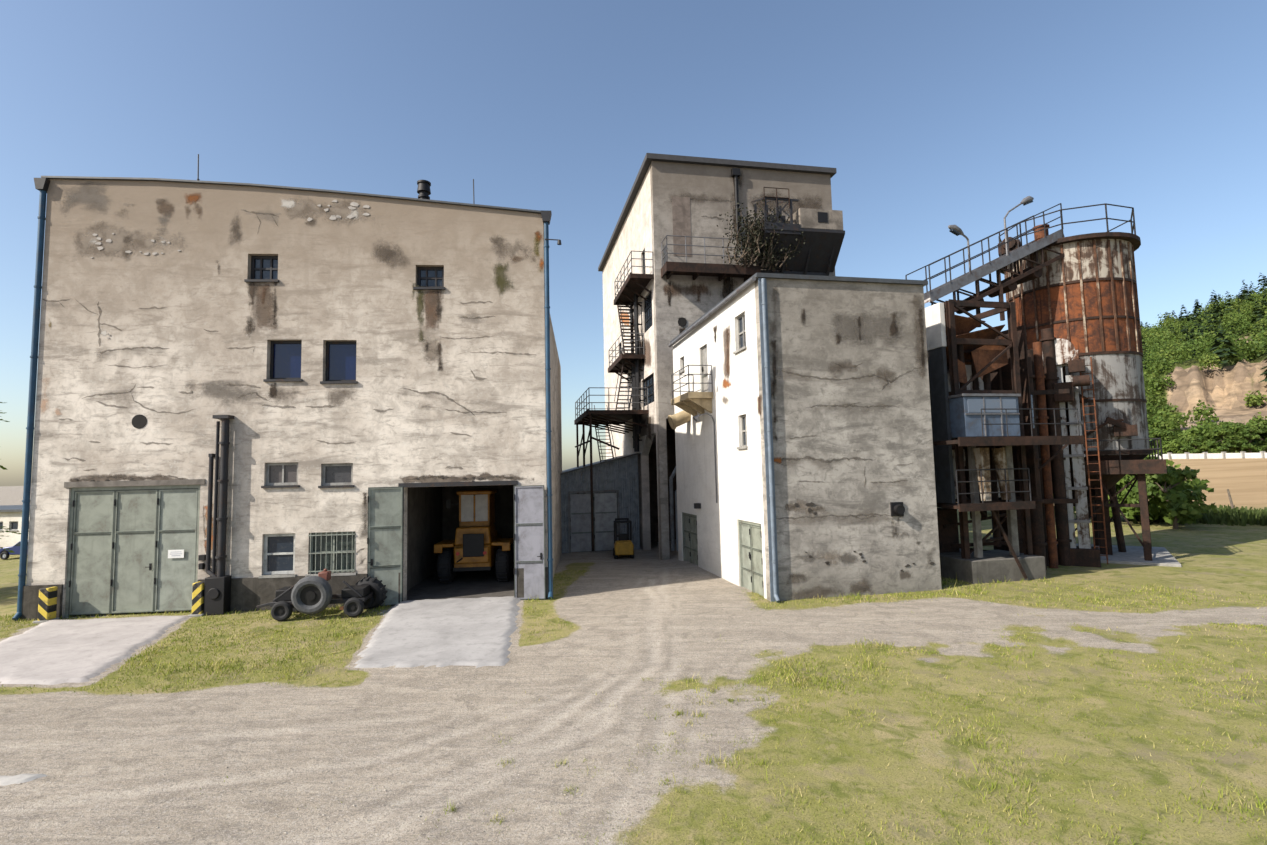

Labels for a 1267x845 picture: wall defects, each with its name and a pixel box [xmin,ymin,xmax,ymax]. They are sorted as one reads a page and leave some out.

leakage [156,200,173,223]
spalling [282,200,370,225]
spalling [76,223,183,258]
leakage [376,246,404,266]
leakage [492,238,521,293]
leakage [247,282,277,332]
leakage [413,284,442,370]
rust [1010,280,1141,353]